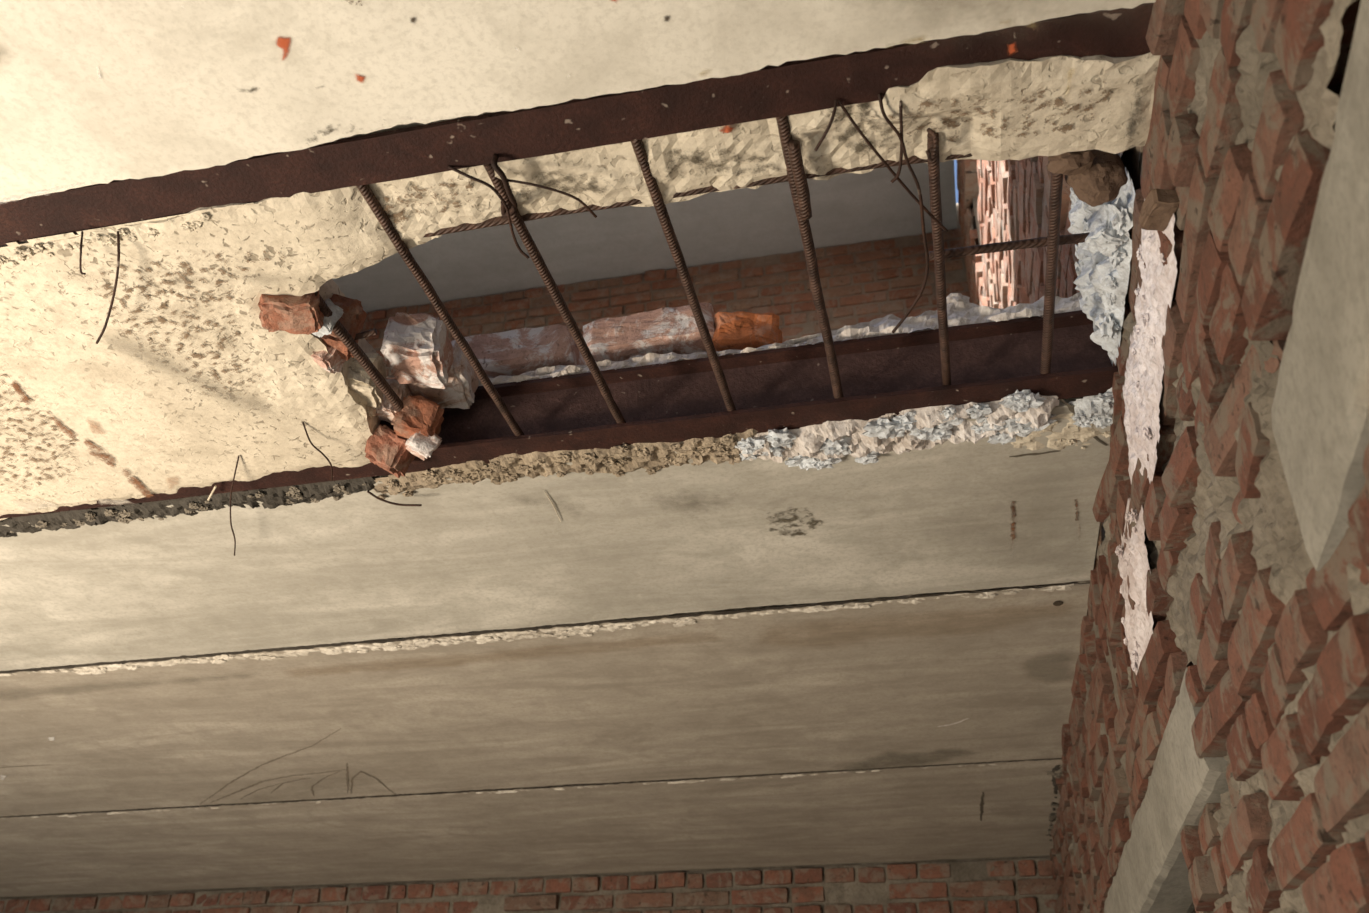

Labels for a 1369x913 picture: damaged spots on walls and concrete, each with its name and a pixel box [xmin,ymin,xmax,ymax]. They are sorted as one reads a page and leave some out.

rust [276,37,290,60]
spalling [0,213,211,269]
rust [11,382,30,405]
rust [47,412,153,498]
spalling [0,290,758,537]
peeling [1011,413,1111,451]
leakage [770,509,822,536]
crack [0,582,1090,674]
crack [0,729,1057,821]
spalling [1046,764,1063,841]